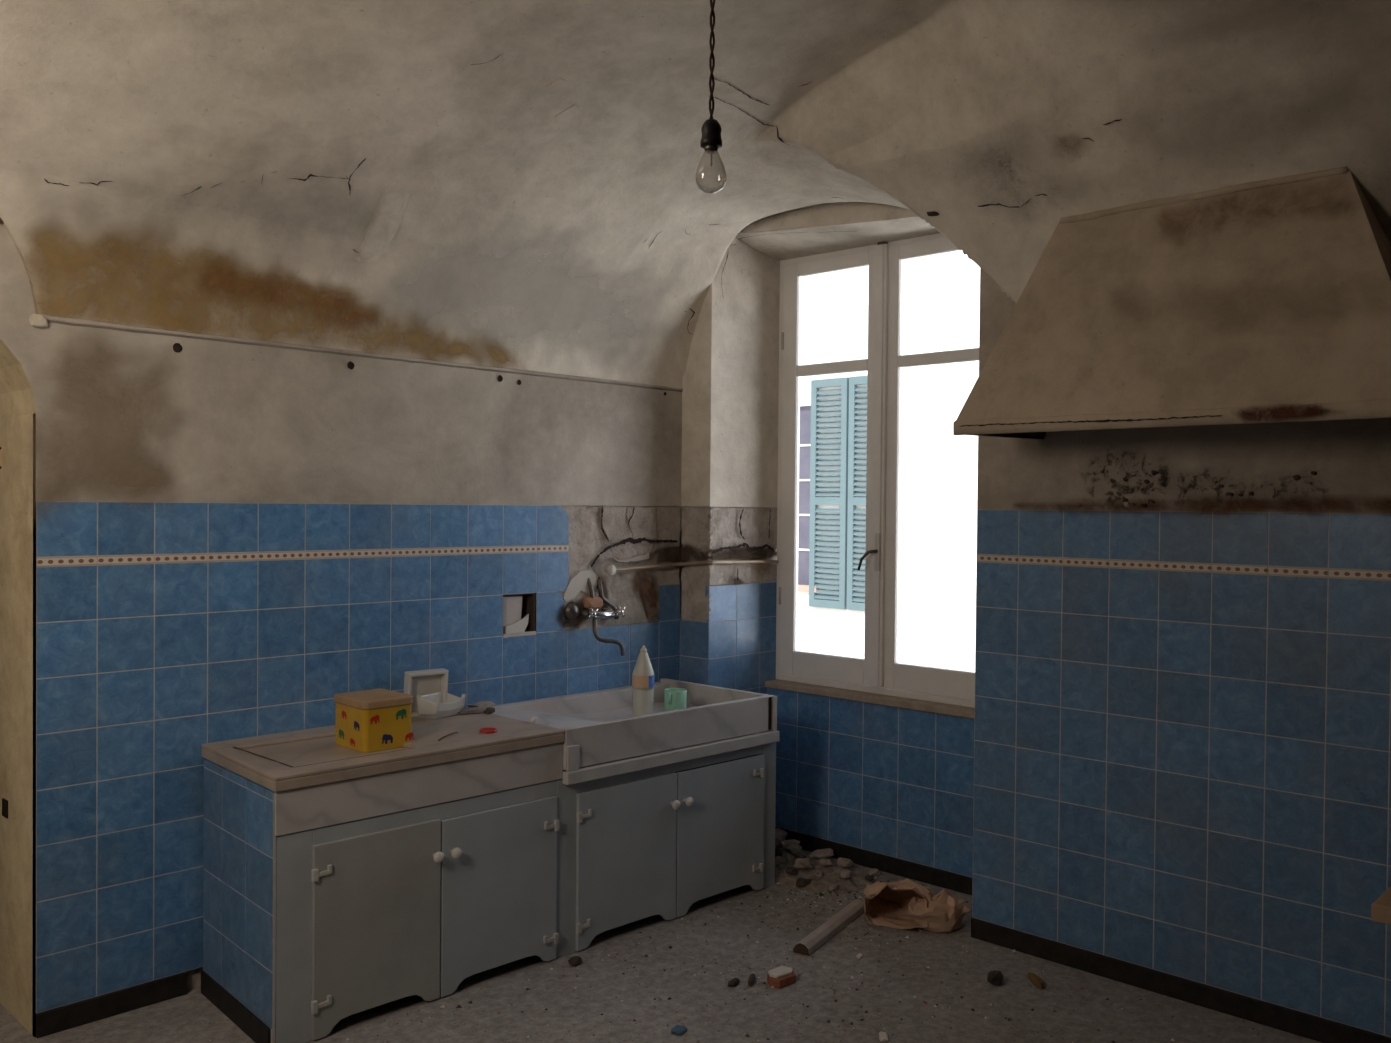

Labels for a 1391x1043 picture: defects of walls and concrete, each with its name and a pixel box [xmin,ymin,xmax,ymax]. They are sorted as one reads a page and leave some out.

crack [709,78,789,145]
crack [44,178,112,186]
crack [262,158,366,194]
water stain [30,231,511,365]
spalling [558,506,777,630]